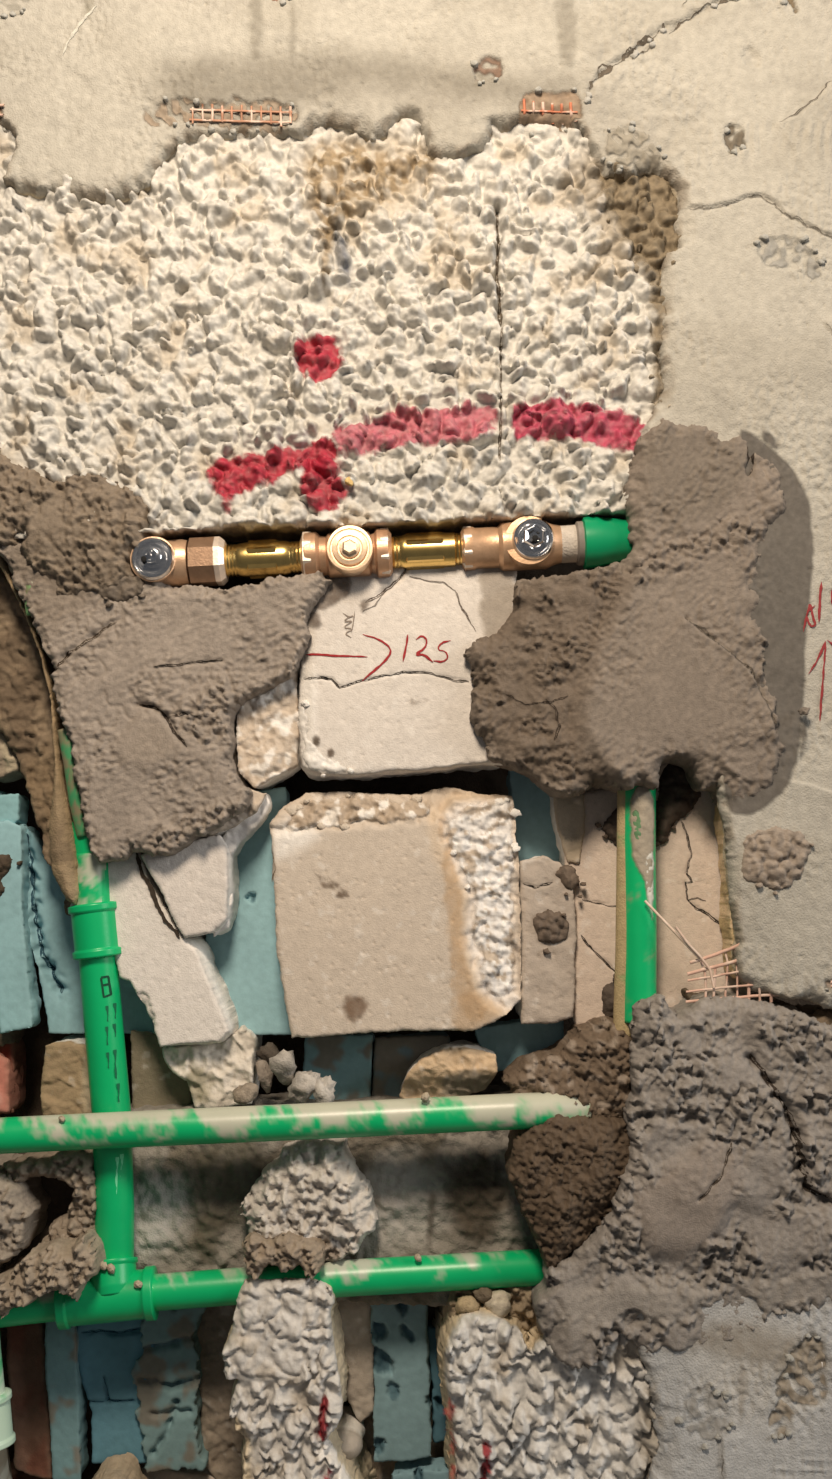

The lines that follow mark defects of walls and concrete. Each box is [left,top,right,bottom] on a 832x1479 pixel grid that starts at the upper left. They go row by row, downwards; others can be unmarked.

spalling [144,96,298,139]
crack [781,81,830,122]
crack [690,194,832,238]
spalling [600,120,682,404]
spalling [0,732,24,783]
spalling [298,700,354,778]
spalling [284,794,430,830]
spalling [448,797,522,996]
crack [681,822,719,924]
peeling [674,1382,736,1450]
spalling [769,1333,832,1440]